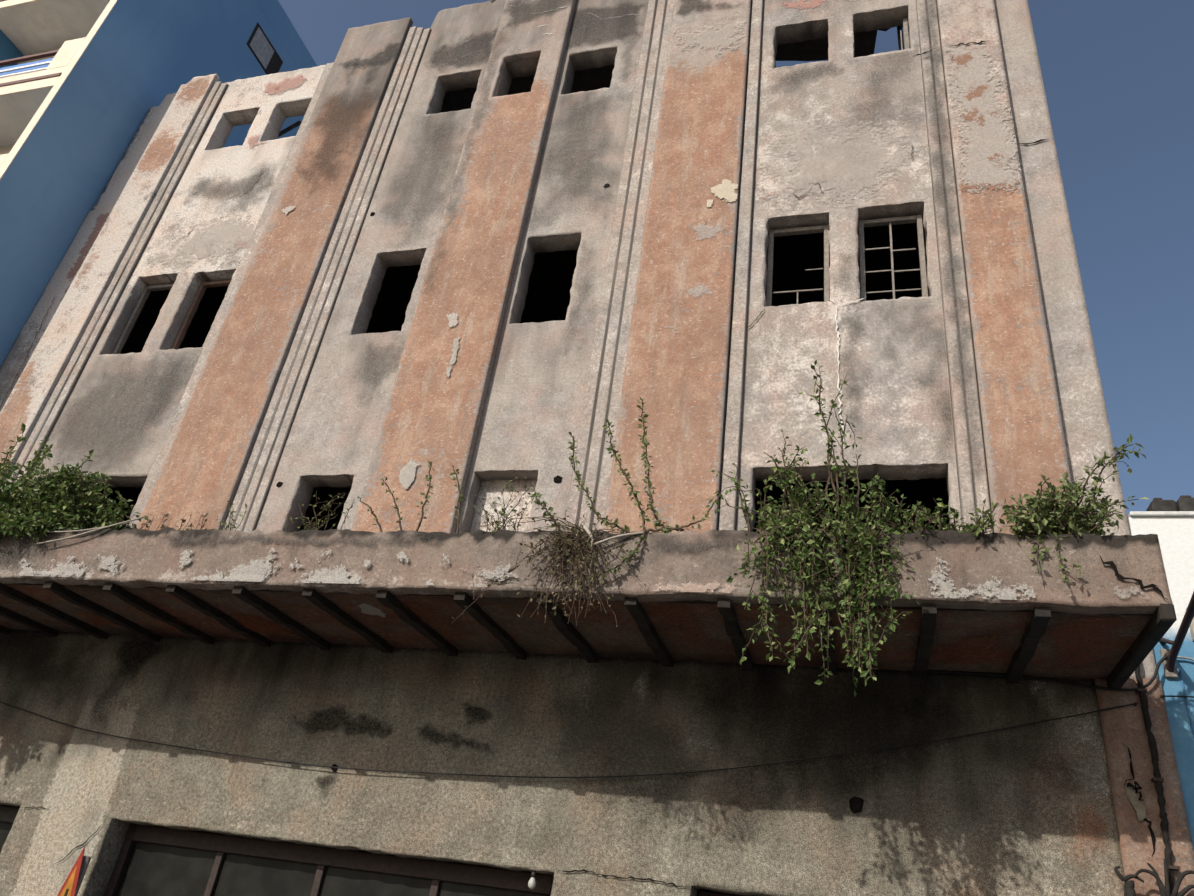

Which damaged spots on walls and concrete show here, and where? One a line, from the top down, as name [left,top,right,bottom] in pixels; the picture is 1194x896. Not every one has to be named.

water stain [678,0,727,15]
water stain [195,169,271,210]
peeling [707,179,738,207]
crack [830,298,864,440]
peeling [19,554,125,578]
peeling [191,545,374,584]
peeling [924,557,1036,600]
crack [1100,556,1168,600]
water stain [297,708,391,736]
water stain [420,726,488,748]
crack [1123,744,1135,786]
crack [1143,819,1156,856]